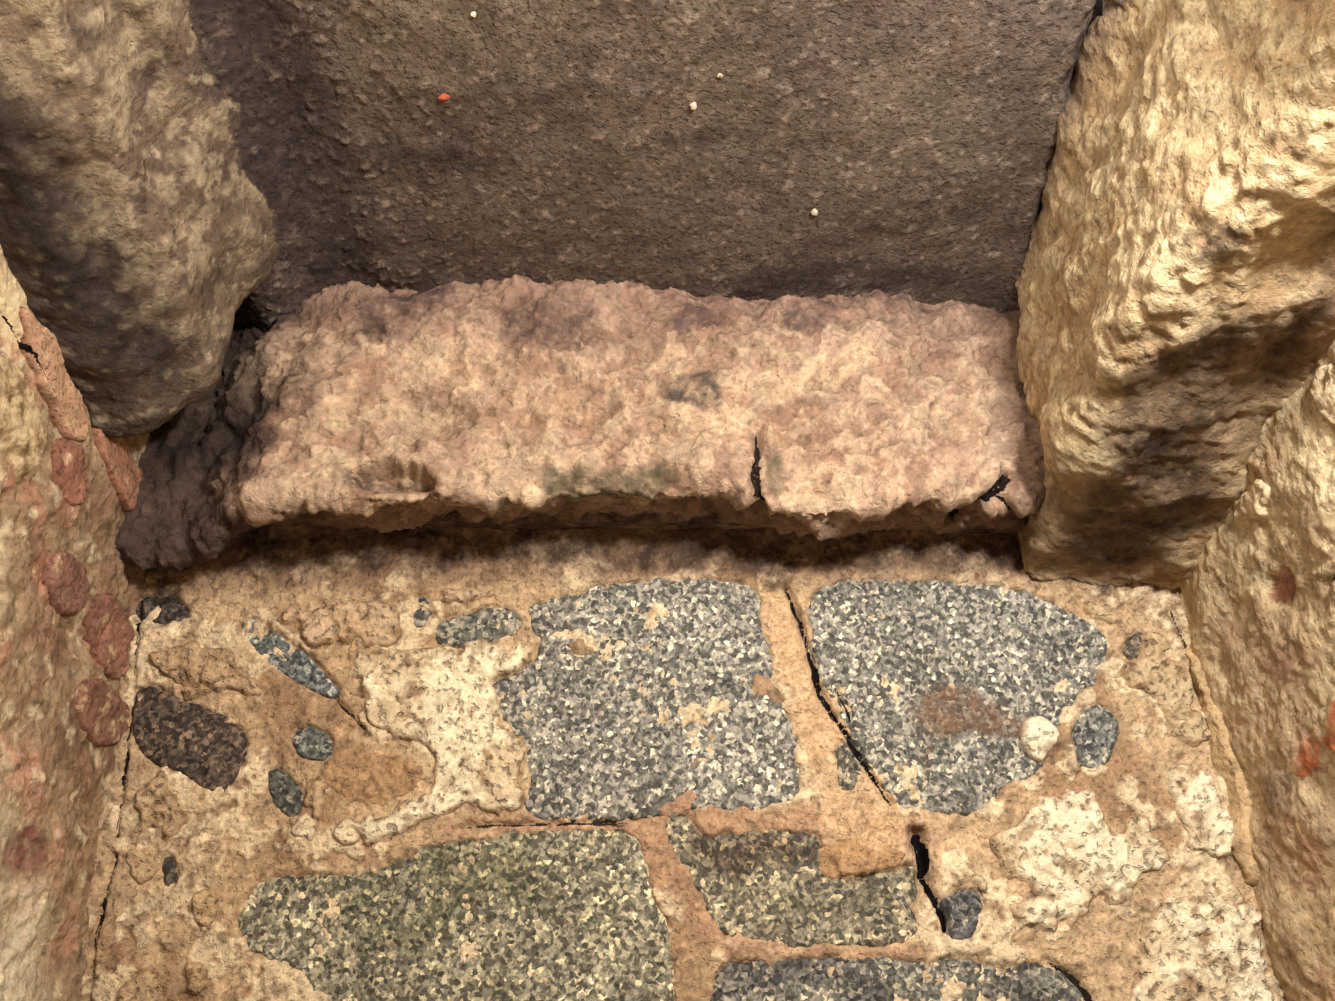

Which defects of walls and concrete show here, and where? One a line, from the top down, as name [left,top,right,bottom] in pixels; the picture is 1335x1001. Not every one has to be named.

crack [1086,0,1103,33]
crack [1068,64,1076,88]
crack [750,434,765,500]
crack [784,588,891,806]
crack [910,834,946,934]